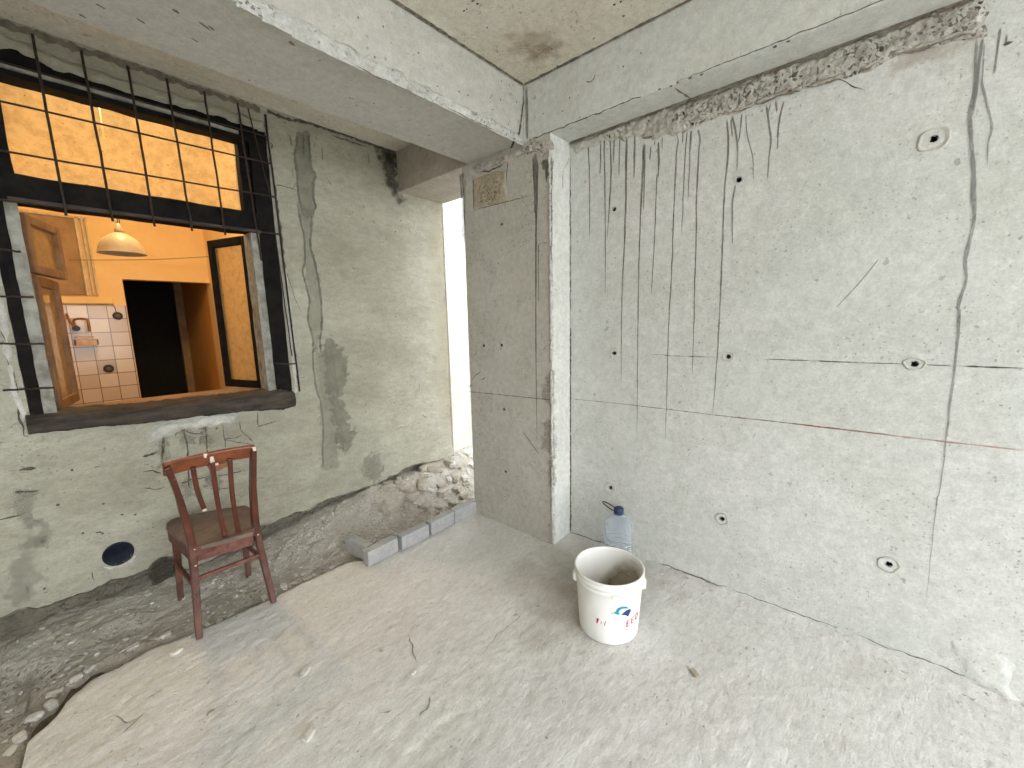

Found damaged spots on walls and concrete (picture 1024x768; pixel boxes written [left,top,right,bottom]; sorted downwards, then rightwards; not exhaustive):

peeling [0,33,265,132]
damp [368,149,402,204]
damp [756,87,784,176]
spalling [658,0,883,98]
damp [289,131,355,465]
damp [588,136,663,418]
damp [667,130,701,379]
damp [713,94,754,406]
spalling [0,297,26,422]
peeling [145,413,238,446]
crack [143,412,276,490]
flaking render [0,553,225,619]